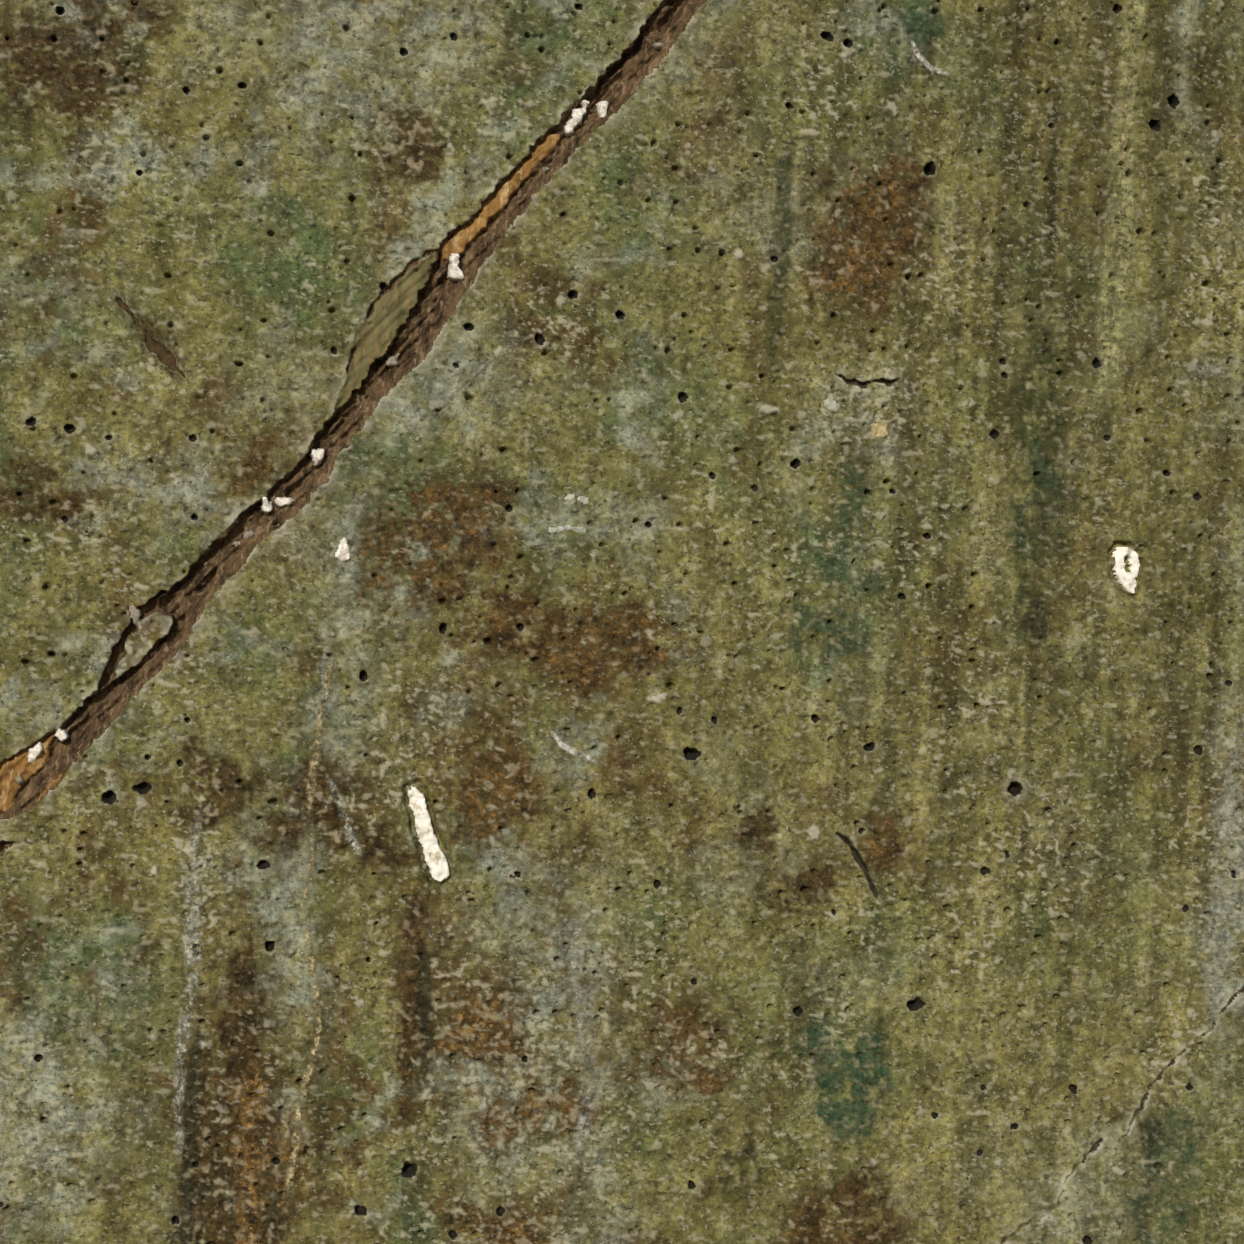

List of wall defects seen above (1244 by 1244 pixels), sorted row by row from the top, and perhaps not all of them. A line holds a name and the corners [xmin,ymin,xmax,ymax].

rust [805,157,930,315]
crack [0,0,707,857]
crack [836,833,878,897]
rust [175,943,293,1244]